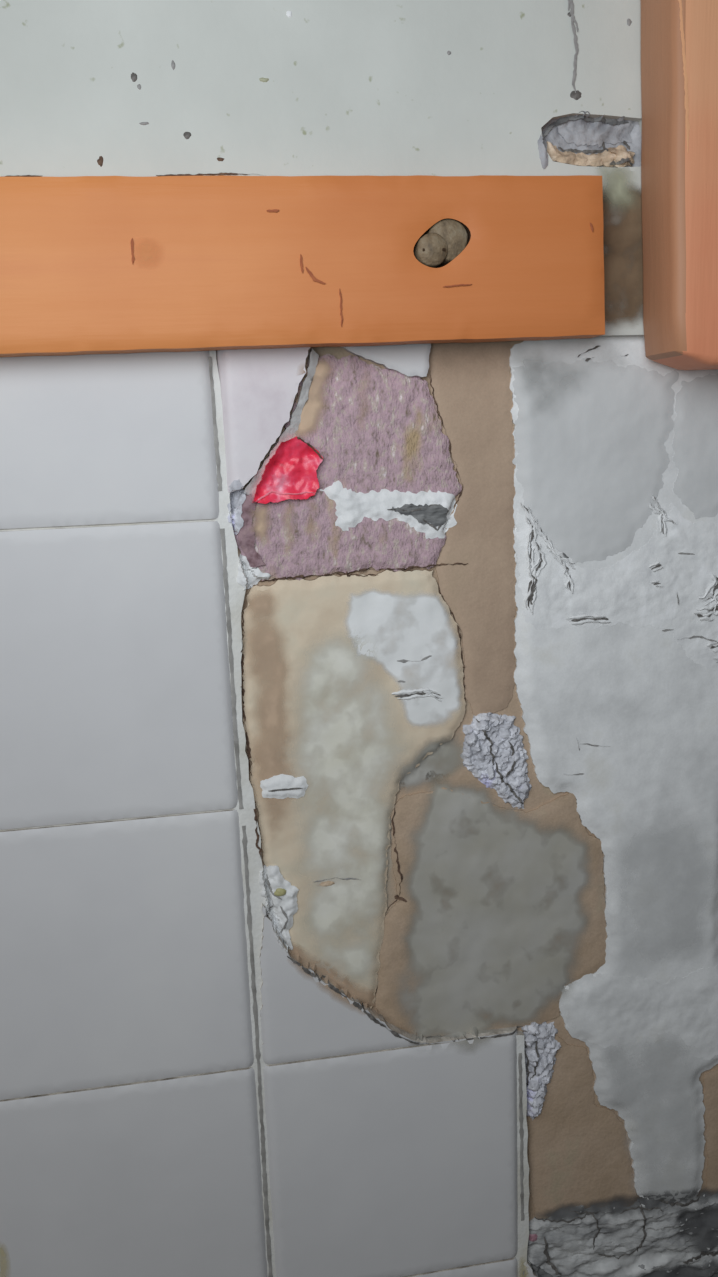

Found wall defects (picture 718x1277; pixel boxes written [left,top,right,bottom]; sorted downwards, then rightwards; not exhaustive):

spalling [537,111,641,169]
peeling [244,348,323,504]
crack [259,563,468,708]
crack [521,505,611,625]
crack [649,495,718,663]
crack [241,611,523,1044]
peeling [341,336,718,1277]